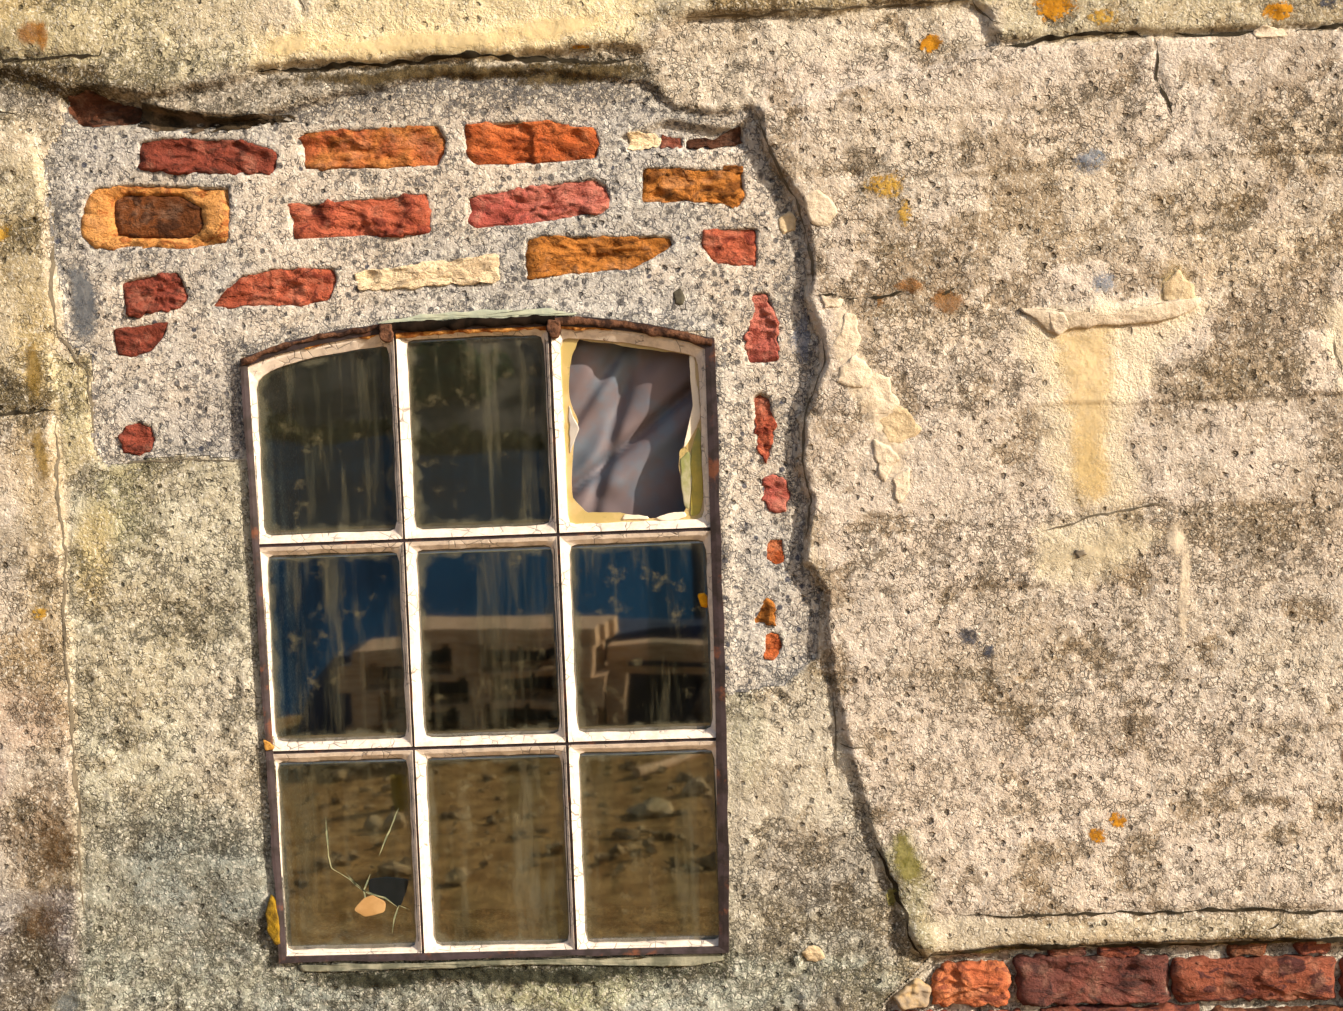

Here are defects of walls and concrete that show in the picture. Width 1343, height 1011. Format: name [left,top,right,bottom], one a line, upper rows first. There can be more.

crack [691,0,1253,120]
crack [1296,23,1343,31]
crack [756,111,902,300]
flaking render [44,68,922,695]
crack [801,340,826,542]
crack [875,845,1343,958]